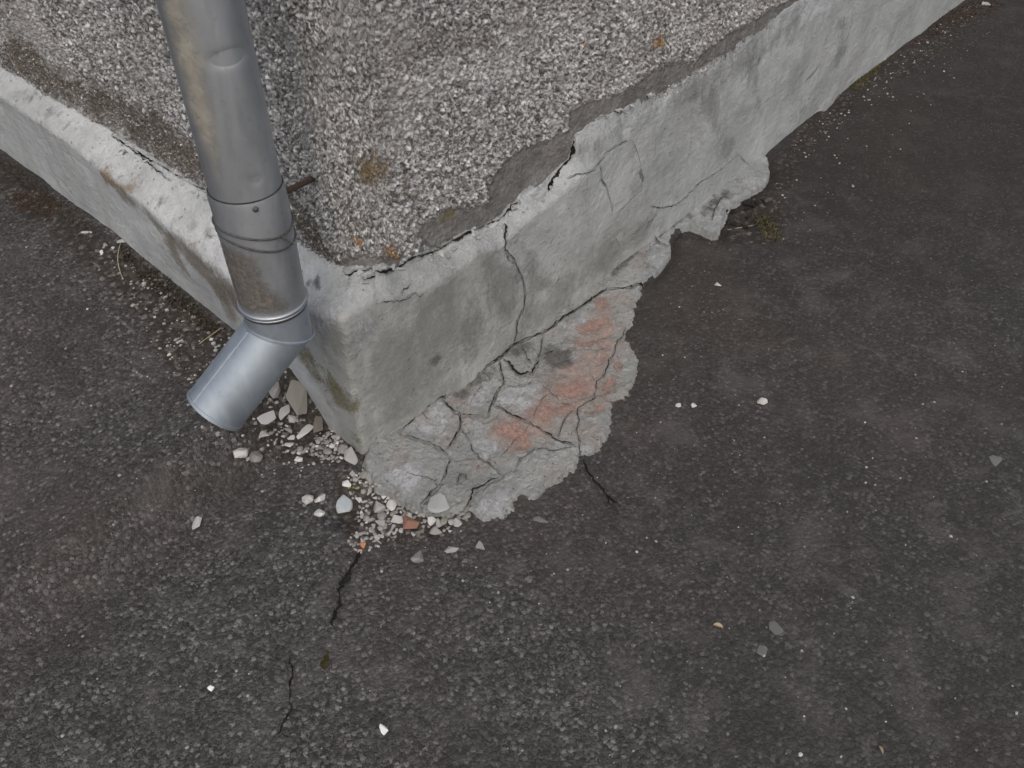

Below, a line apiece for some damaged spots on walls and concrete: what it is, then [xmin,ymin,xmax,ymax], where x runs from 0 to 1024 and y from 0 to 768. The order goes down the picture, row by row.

spalling [421,0,800,262]
crack [547,137,749,246]
spalling [340,236,407,284]
crack [342,202,645,509]
crack [330,548,361,630]
crack [270,657,293,743]